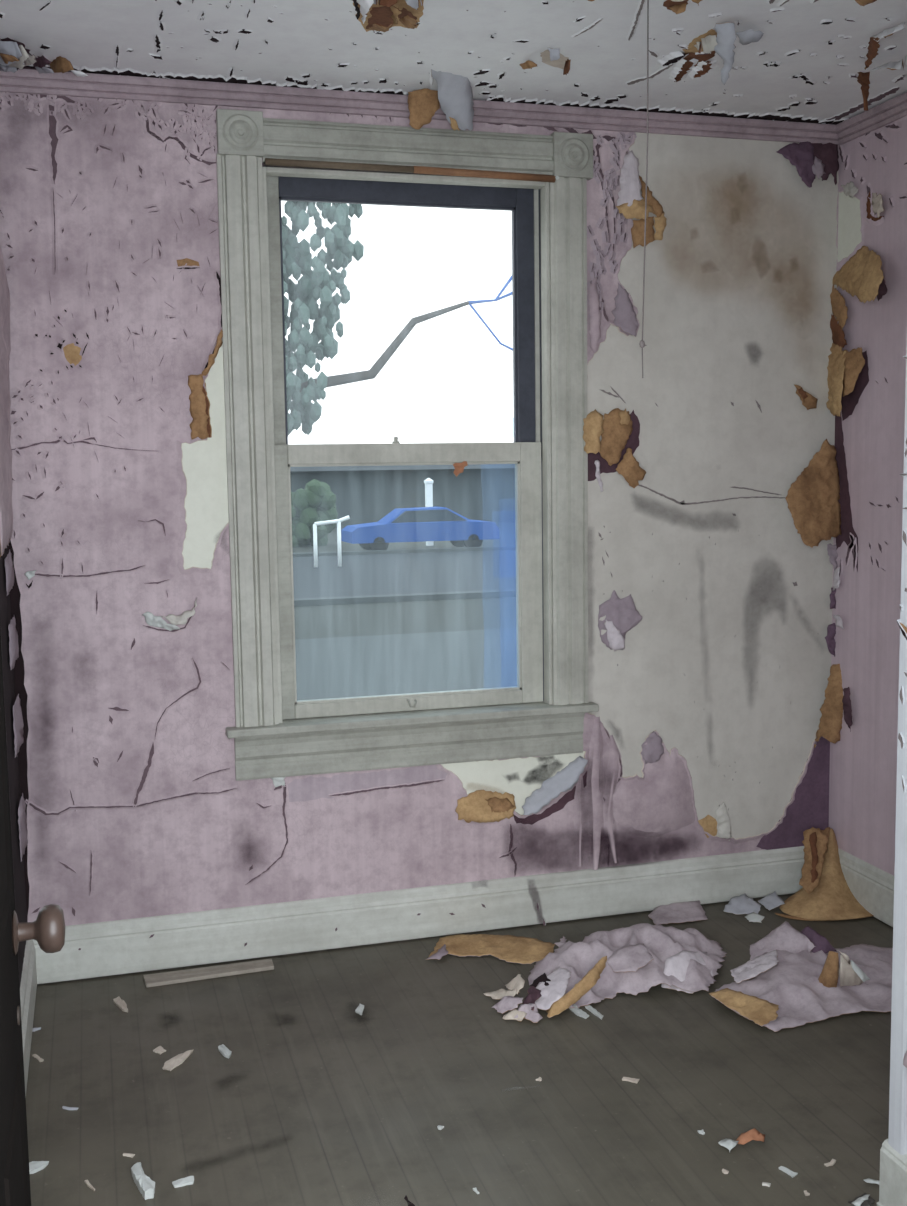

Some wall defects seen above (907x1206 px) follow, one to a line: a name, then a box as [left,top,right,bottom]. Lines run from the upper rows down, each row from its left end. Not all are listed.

peeling [0,37,89,77]
peeling [149,0,270,79]
peeling [348,0,424,50]
peeling [466,39,642,108]
peeling [657,0,907,112]
flaking render [182,340,229,569]
flaking render [485,116,907,839]
crack [137,518,167,536]
crack [7,537,290,922]
flaking render [441,751,585,815]
water stain [578,833,634,853]
crack [403,1195,416,1206]